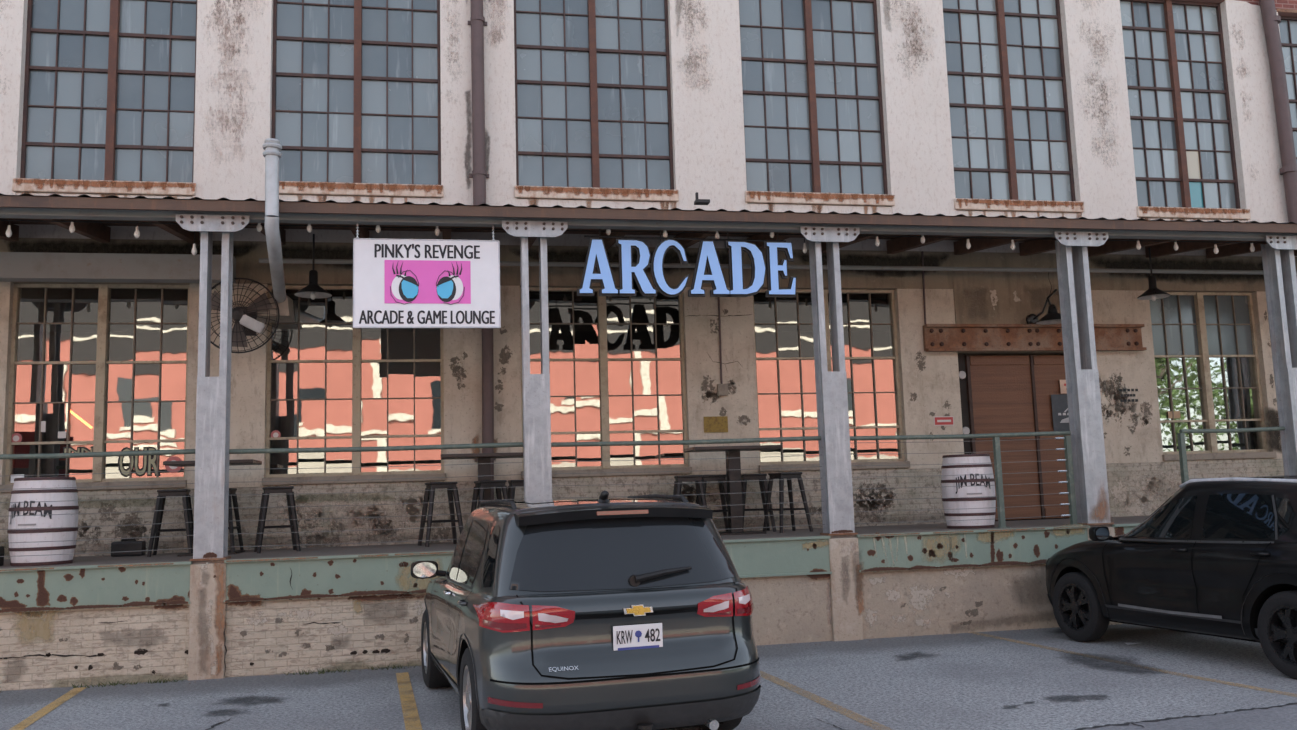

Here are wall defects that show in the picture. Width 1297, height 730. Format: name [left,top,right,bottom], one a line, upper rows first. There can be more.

rust [16,179,196,199]
rust [279,182,442,203]
rust [747,191,894,214]
rust [956,199,1083,210]
rust [1139,207,1250,221]
peeling [1099,373,1152,456]